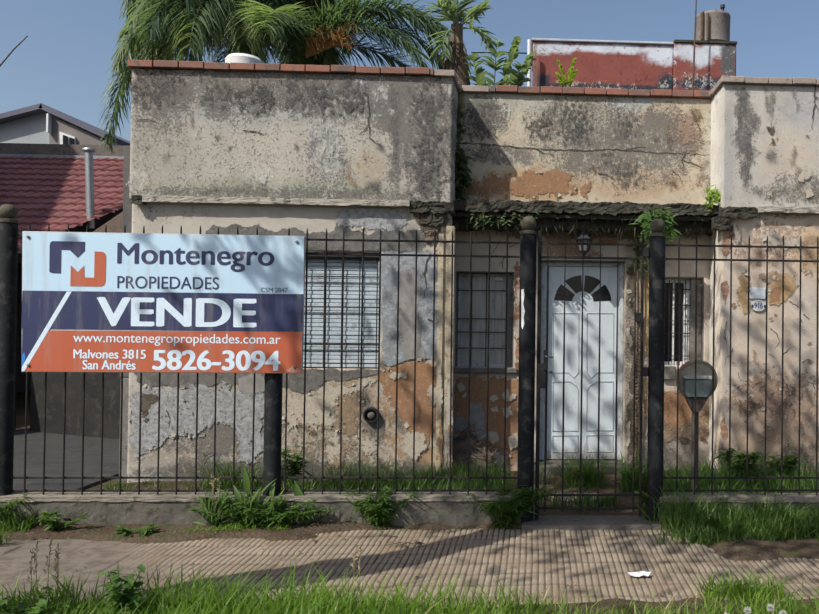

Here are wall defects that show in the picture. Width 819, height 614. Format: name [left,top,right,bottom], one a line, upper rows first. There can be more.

leakage [123,68,511,201]
crack [355,93,383,147]
peeling [463,166,592,201]
leakage [523,97,599,151]
crack [457,109,709,184]
leakage [589,102,651,195]
leakage [733,87,760,187]
leakage [413,212,450,240]
peeling [721,268,808,320]
peeling [282,262,520,474]
peeling [127,380,264,468]
peeling [664,391,709,445]